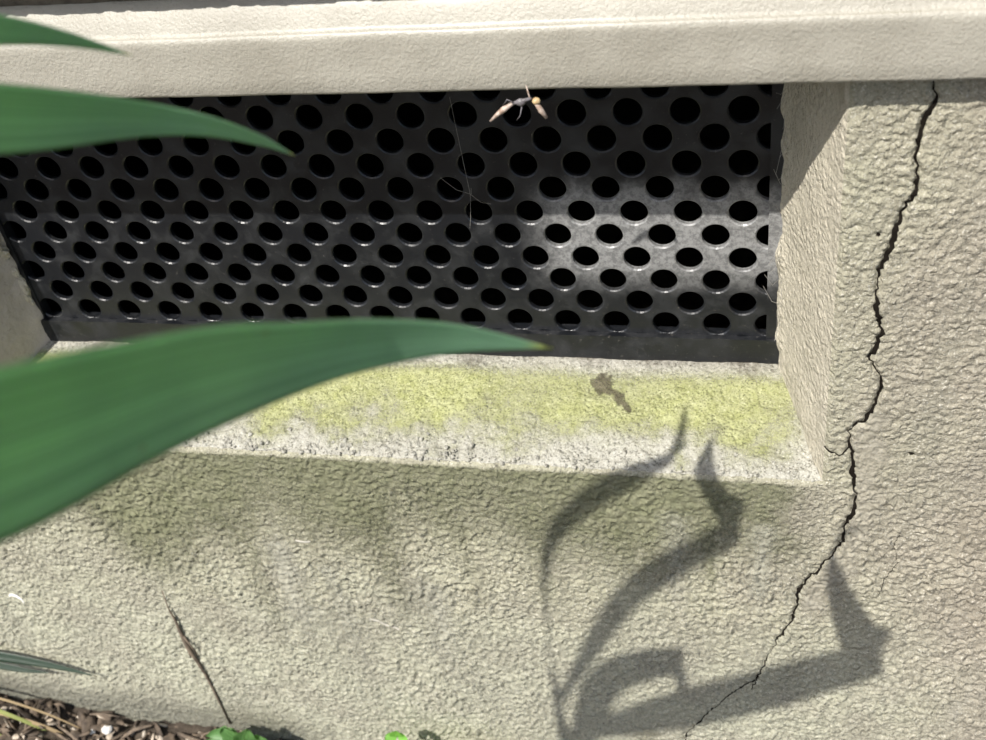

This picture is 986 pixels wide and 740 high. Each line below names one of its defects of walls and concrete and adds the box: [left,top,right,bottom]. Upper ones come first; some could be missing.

crack [685,80,938,740]